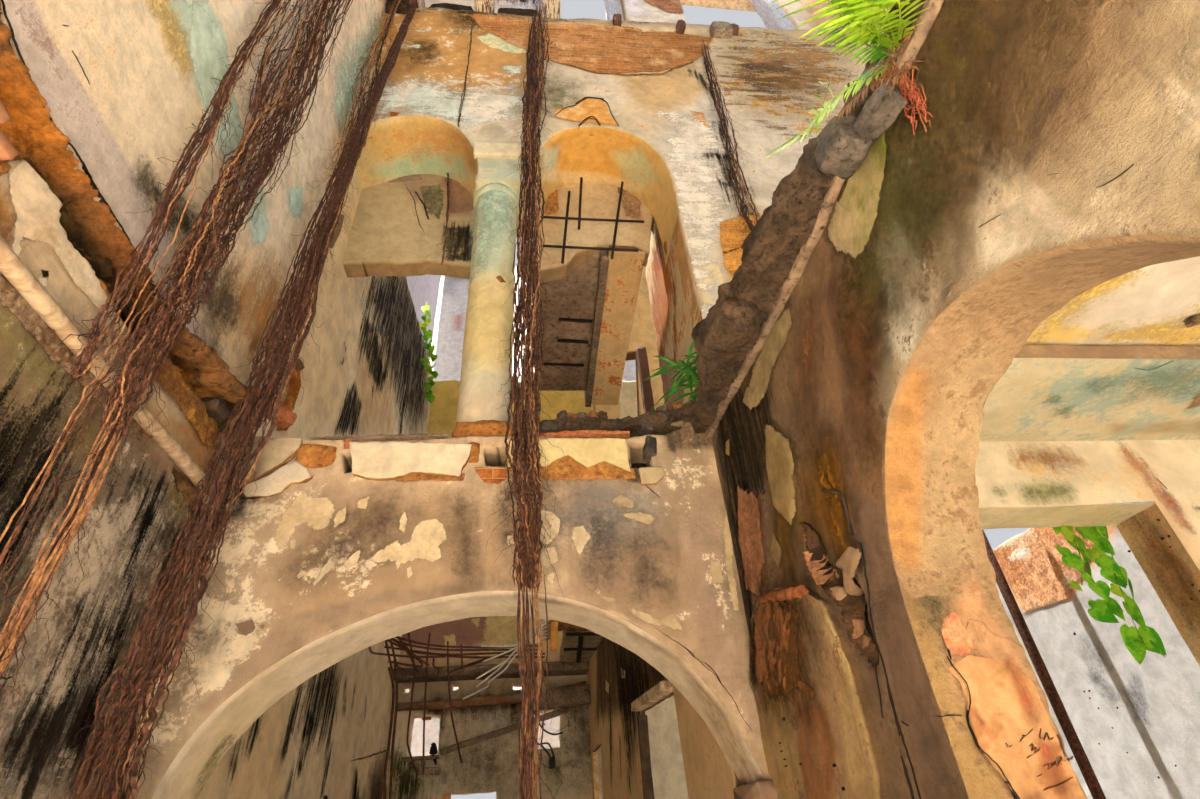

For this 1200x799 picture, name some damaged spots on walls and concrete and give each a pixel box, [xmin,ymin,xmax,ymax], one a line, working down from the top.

flaking render [335,13,714,129]
spalling [0,0,173,340]
mould [334,276,429,436]
leakage [0,390,84,609]
leakage [0,466,188,799]
leakage [226,714,263,783]
leakage [279,662,367,799]
peeling [297,512,446,586]
flaking render [396,442,512,484]
flaking render [535,420,657,484]
spalling [709,486,879,666]
crack [860,542,1022,799]